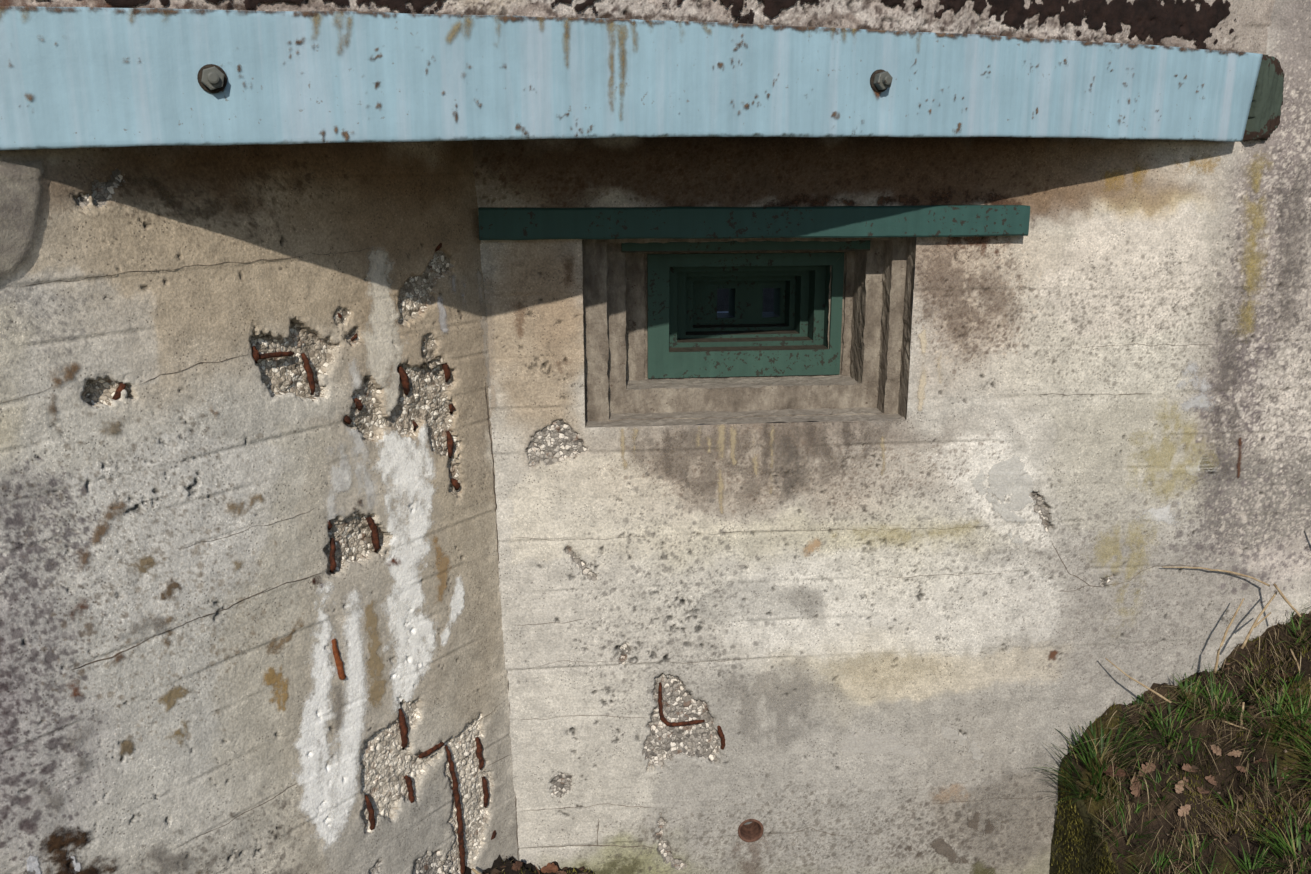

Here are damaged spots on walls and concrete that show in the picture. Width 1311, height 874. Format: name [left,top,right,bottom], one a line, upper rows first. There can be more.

corrosion [0,0,1062,93]
corrosion [1120,43,1246,55]
spalling [81,377,134,408]
spalling [249,307,361,401]
water stain [327,250,465,711]
spalling [343,333,465,498]
spalling [523,419,590,467]
water stain [697,424,737,513]
spalling [323,514,388,576]
water stain [293,582,367,849]
spalling [642,673,725,770]
spalling [359,699,496,874]